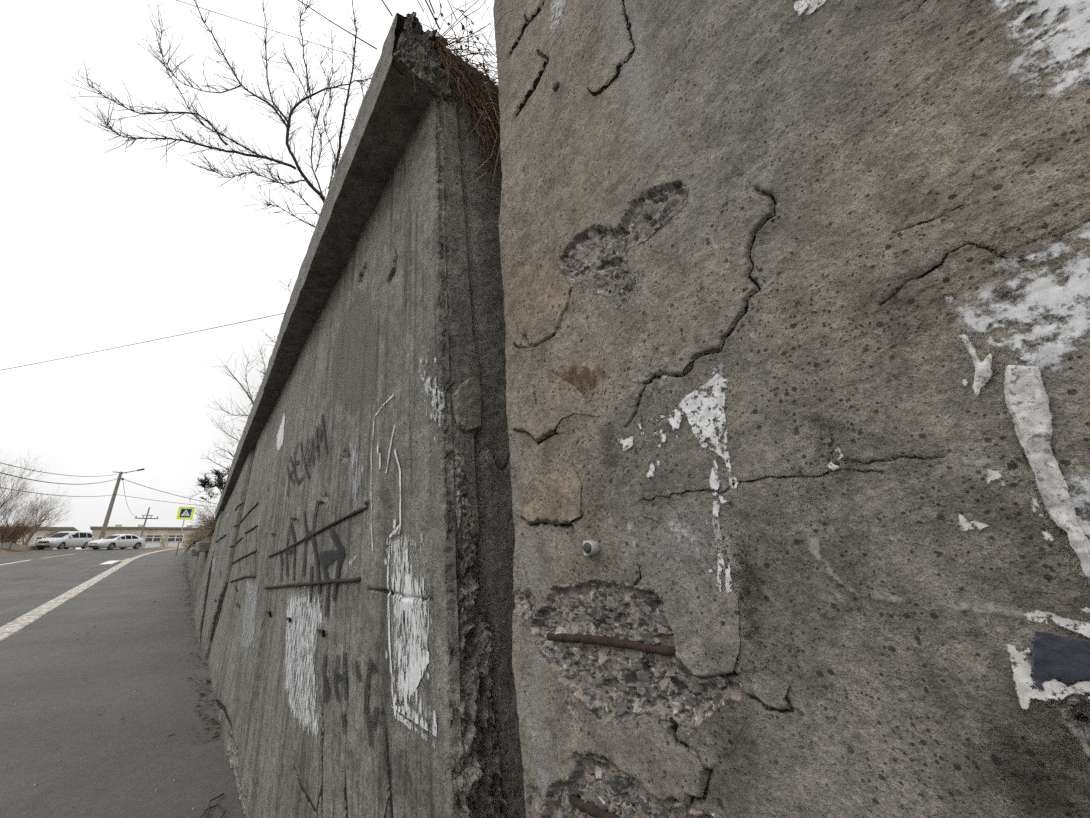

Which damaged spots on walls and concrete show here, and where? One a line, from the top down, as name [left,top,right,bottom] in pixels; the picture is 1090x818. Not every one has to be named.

crack [509,2,549,116]
spalling [505,180,688,347]
flaking render [624,189,775,384]
crack [634,190,777,417]
crack [895,205,962,233]
crack [880,220,1090,306]
flaking render [419,357,483,440]
crack [637,456,941,522]
spalling [453,448,508,818]
spalling [512,365,791,818]